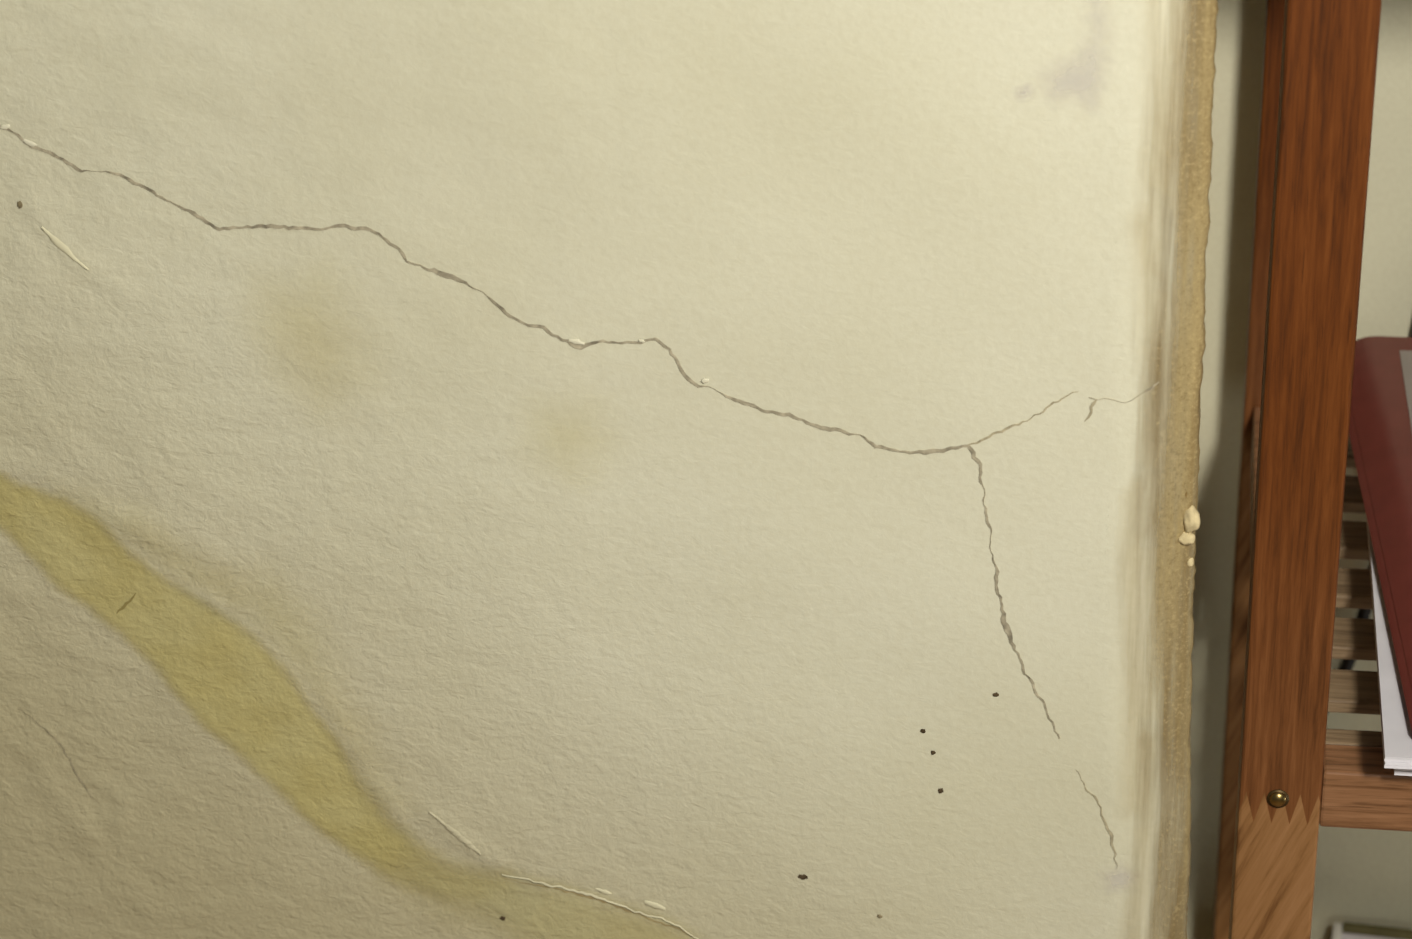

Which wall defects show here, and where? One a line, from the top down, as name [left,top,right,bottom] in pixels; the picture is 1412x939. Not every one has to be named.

crack [0,124,1159,739]
crack [18,708,100,804]
leakage [0,476,675,939]
crack [1075,769,1118,869]